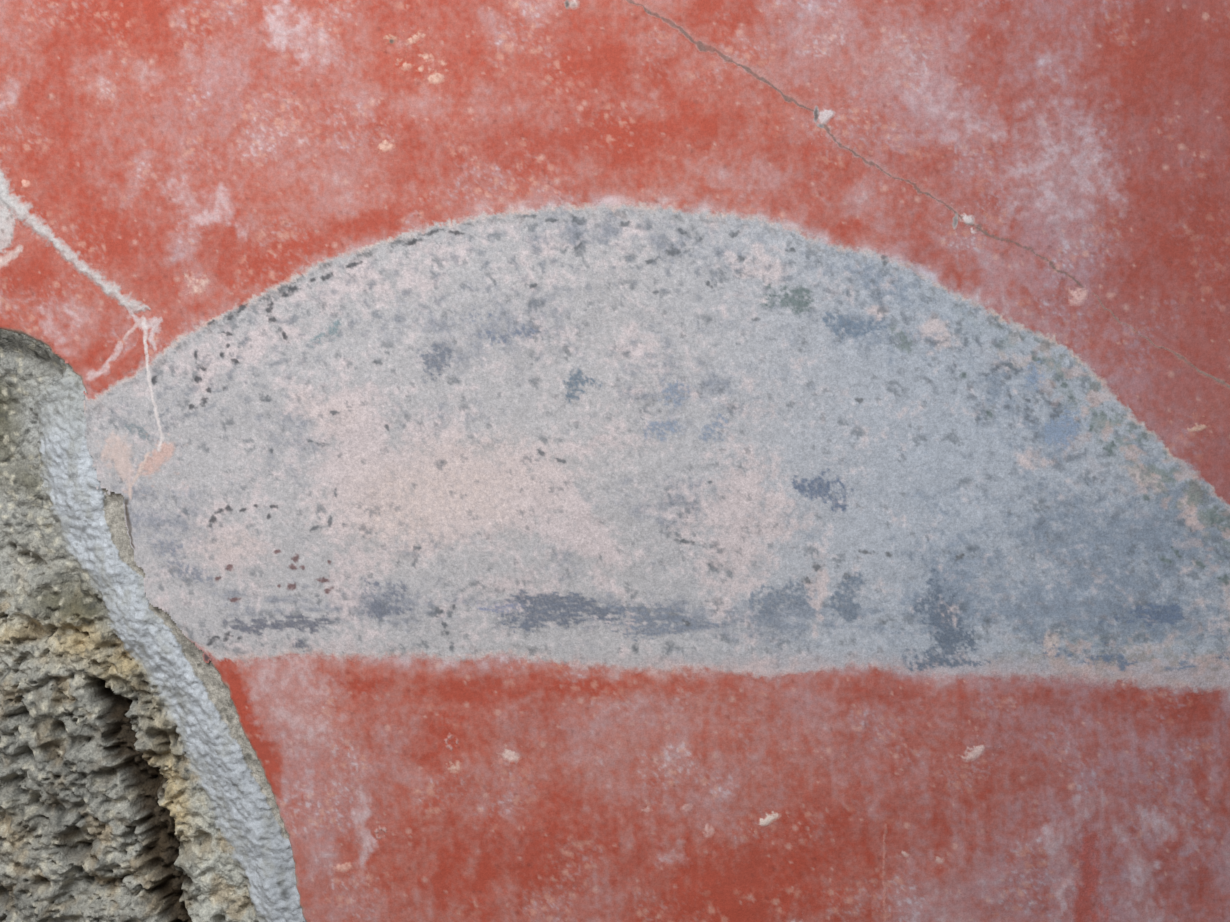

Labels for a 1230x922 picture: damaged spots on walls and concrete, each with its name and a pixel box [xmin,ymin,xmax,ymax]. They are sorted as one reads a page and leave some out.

crack [0,159,165,550]
crack [624,0,1230,392]
peeling [0,199,1230,922]